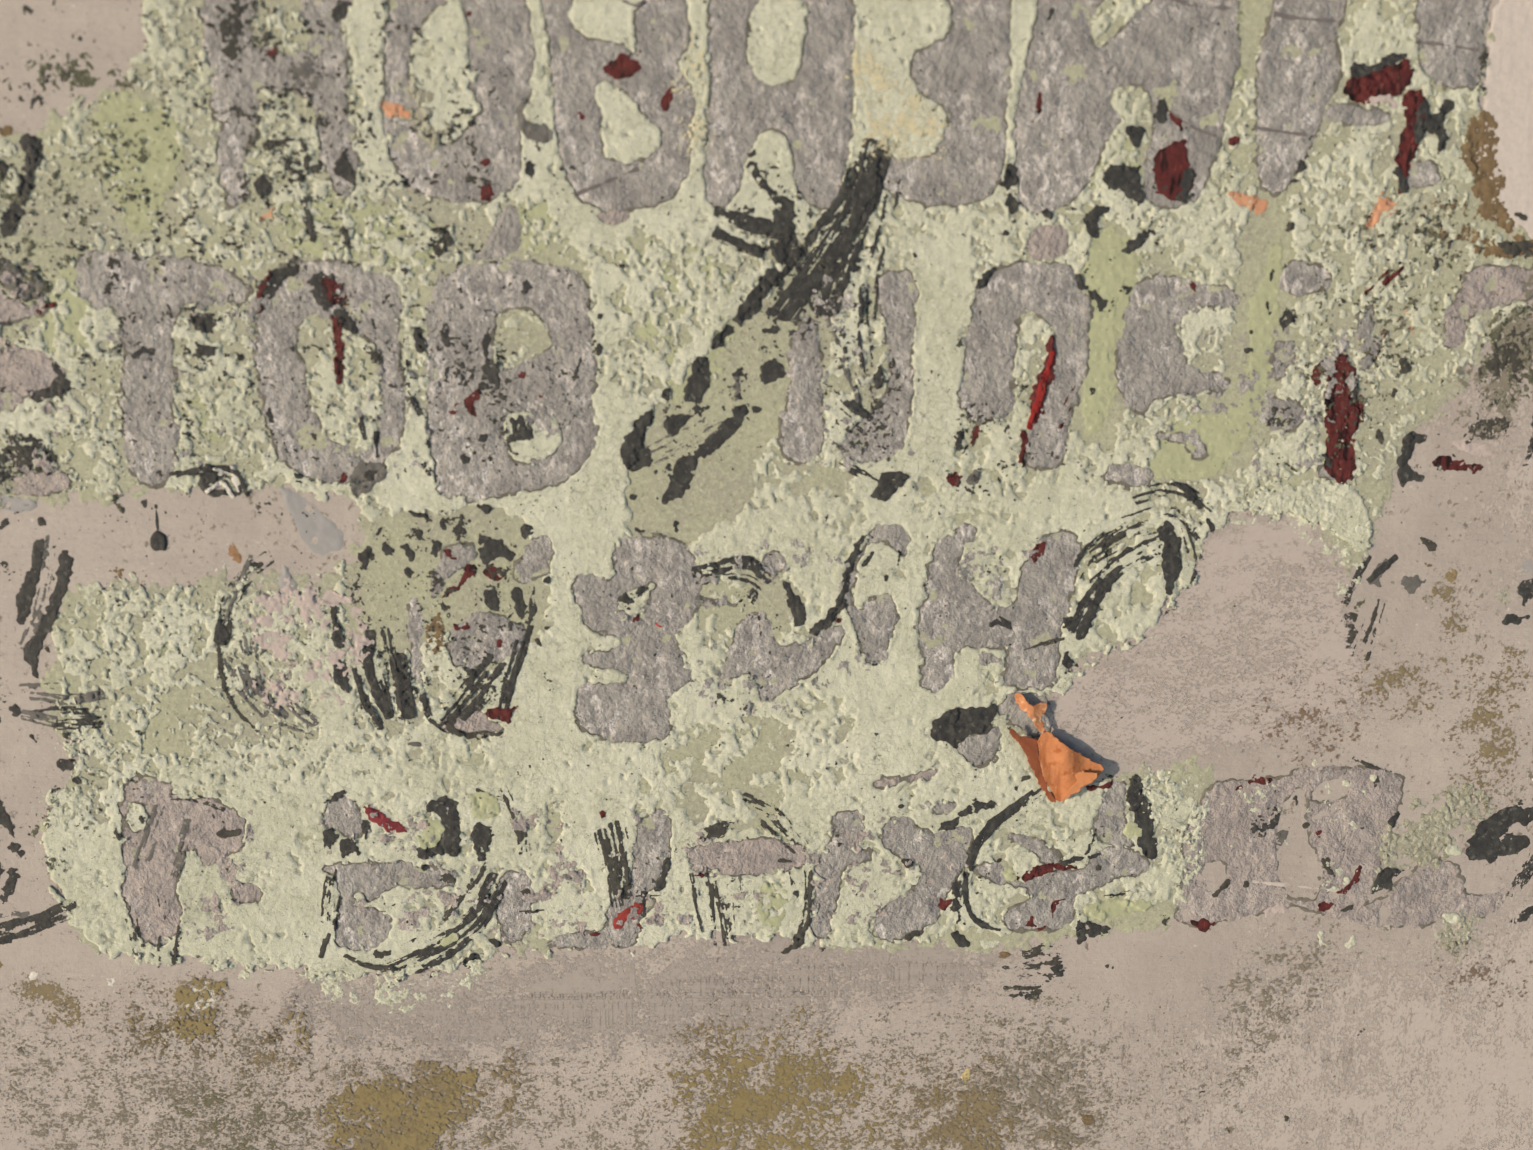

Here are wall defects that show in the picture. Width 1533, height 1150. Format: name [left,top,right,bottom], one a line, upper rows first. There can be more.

peeling [741,0,809,86]
peeling [1072,0,1151,47]
peeling [556,0,675,172]
peeling [1432,417,1507,474]
damp [1416,236,1533,645]
peeling [1494,558,1533,625]
peeling [1341,599,1385,657]
peeling [0,800,25,858]
peeling [1221,774,1289,846]
peeling [1293,756,1533,912]
peeling [0,862,21,904]
damp [0,855,1533,1150]